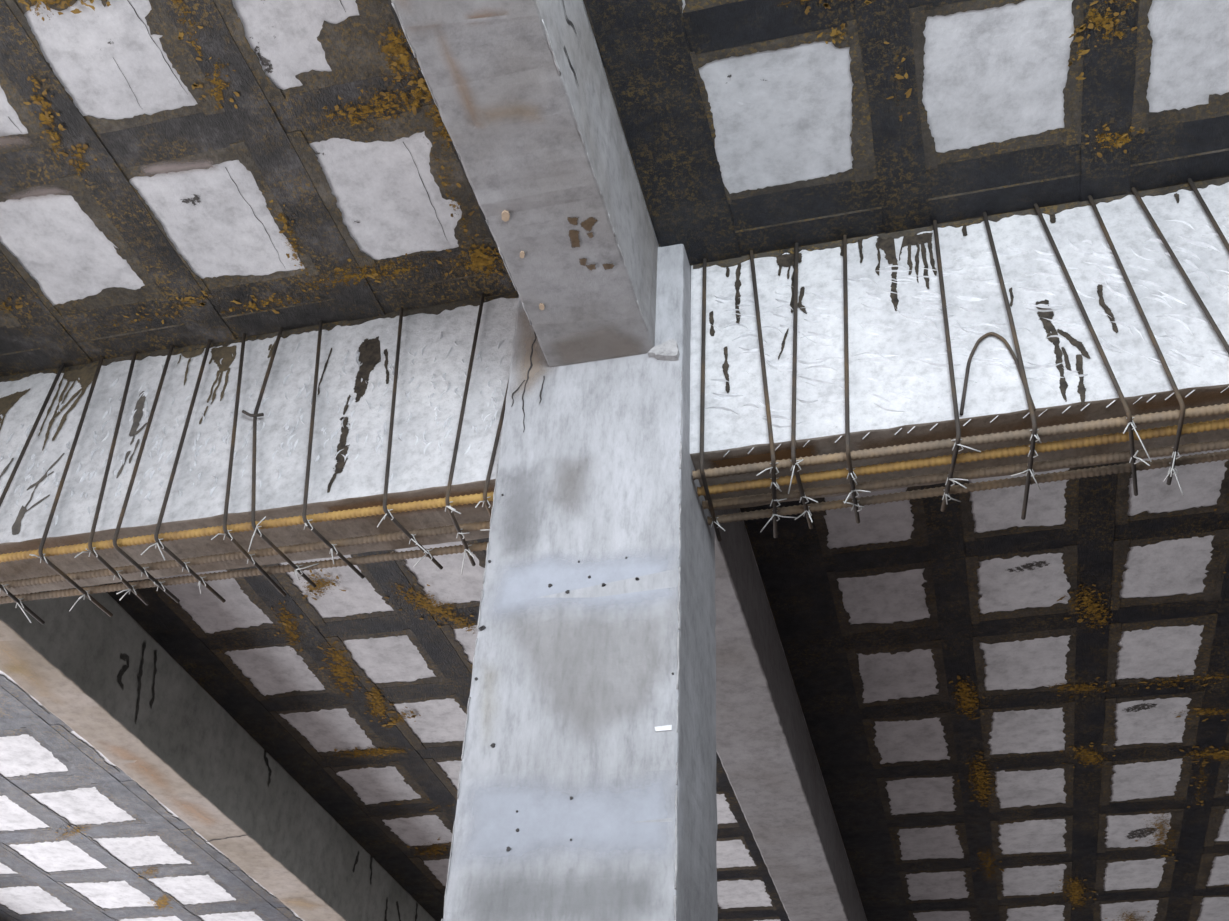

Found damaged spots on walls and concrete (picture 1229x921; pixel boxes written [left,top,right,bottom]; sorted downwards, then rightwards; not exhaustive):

corrosion [18,0,111,21]
corrosion [1068,0,1137,80]
corrosion [23,71,97,181]
corrosion [221,27,505,315]
corrosion [1085,121,1145,158]
damp [693,177,1229,324]
damp [1097,285,1118,333]
damp [116,391,147,478]
damp [0,293,519,451]
damp [327,337,389,493]
damp [722,346,730,393]
corrosion [384,583,476,634]